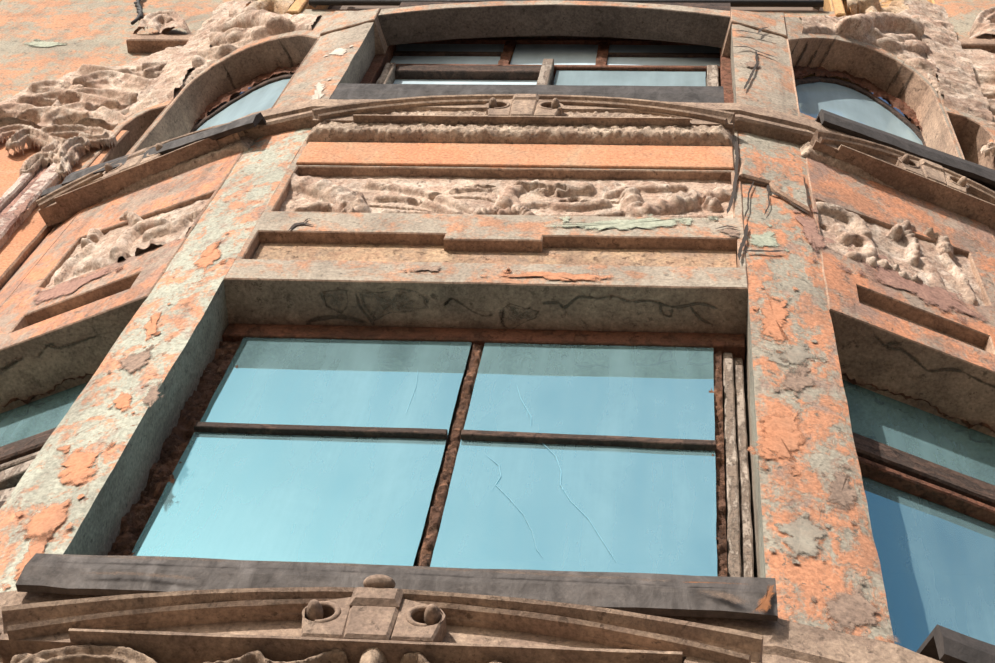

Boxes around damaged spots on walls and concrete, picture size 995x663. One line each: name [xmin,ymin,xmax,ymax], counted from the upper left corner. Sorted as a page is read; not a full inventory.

crack [732,27,777,89]
crack [727,140,809,260]
peeling [545,214,789,252]
peeling [499,267,612,281]
flaking render [107,303,171,373]
peeling [751,285,826,396]
peeling [106,381,163,413]
peeling [748,411,807,476]
peeling [2,441,115,591]
flaking render [769,463,857,564]
flaking render [811,578,881,634]